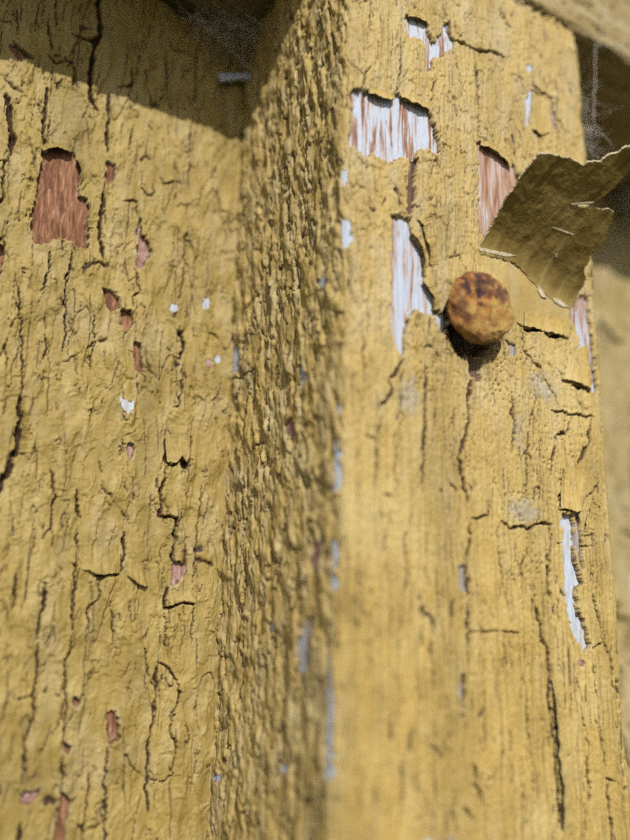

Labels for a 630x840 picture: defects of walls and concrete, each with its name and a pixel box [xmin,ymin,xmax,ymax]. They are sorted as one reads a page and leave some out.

crack [0,96,14,204]
peeling [30,143,89,249]
crack [72,0,110,147]
peeling [369,86,432,111]
peeling [476,139,630,310]
crack [0,280,23,492]
crack [525,329,558,339]
peeling [524,311,568,337]
crack [157,440,195,576]
crack [19,582,46,783]
crack [63,533,124,735]
crack [143,635,177,811]